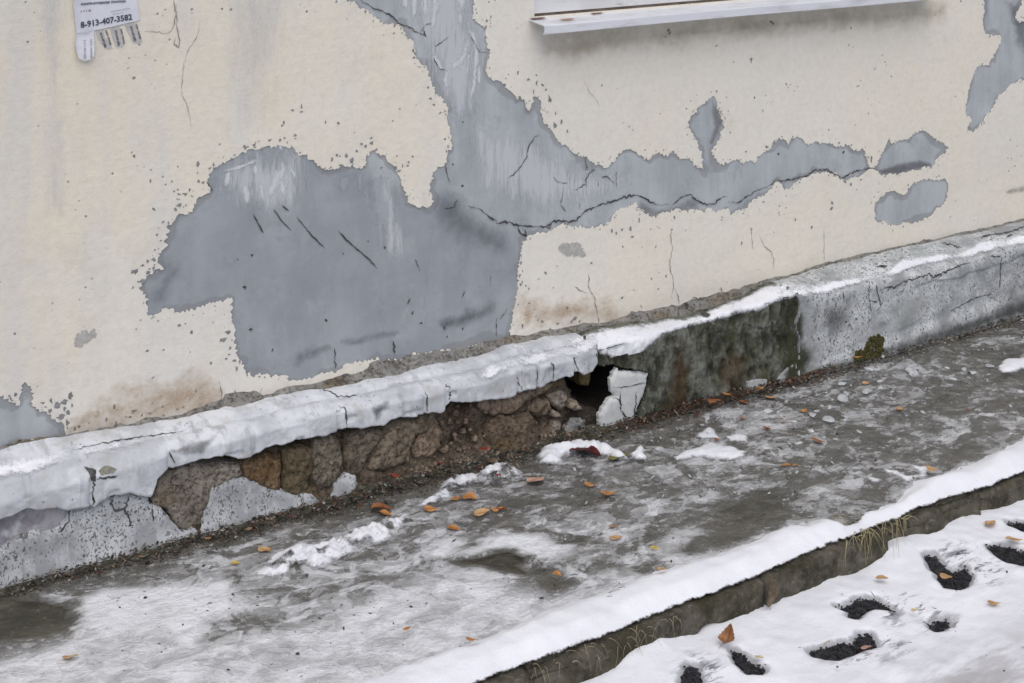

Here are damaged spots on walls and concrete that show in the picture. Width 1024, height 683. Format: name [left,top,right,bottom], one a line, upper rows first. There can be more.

crack [145,3,200,116]
peeling [955,0,1024,132]
peeling [131,0,948,539]
crack [445,156,877,302]
peeling [74,328,97,347]